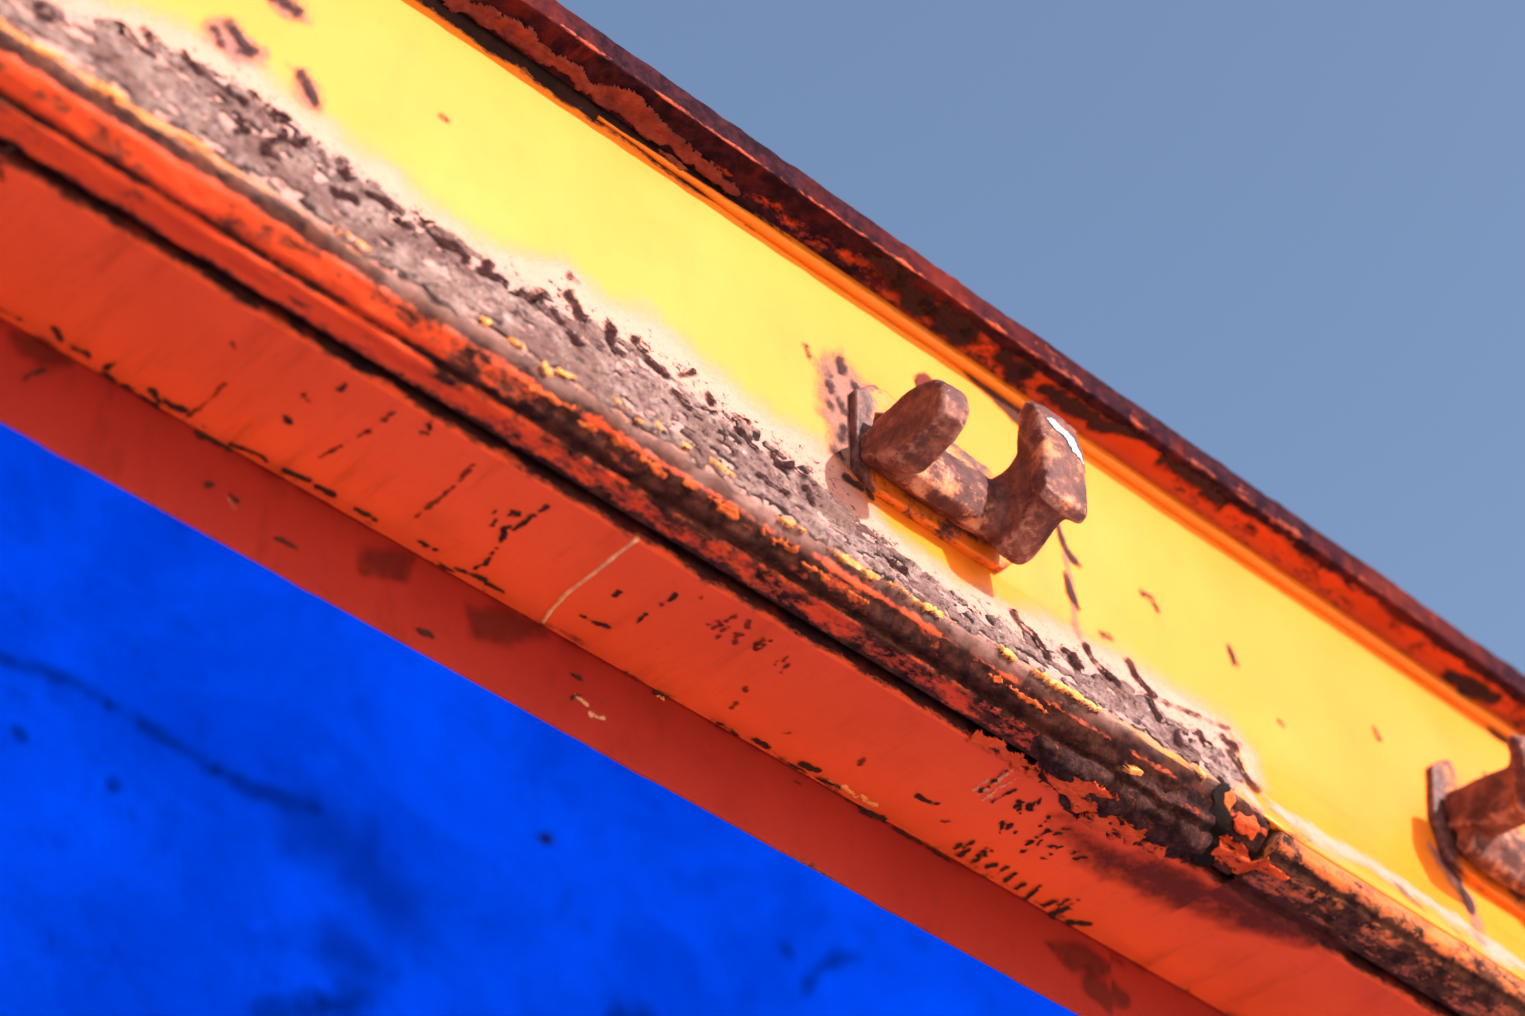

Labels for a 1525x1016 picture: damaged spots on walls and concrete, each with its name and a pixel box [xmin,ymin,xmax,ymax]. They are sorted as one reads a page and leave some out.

peeling [443,0,741,197]
peeling [51,326,189,413]
peeling [195,430,337,498]
rust [0,0,1262,793]
peeling [523,361,739,520]
peeling [417,505,550,593]
peeling [761,516,957,623]
spalling [706,615,773,651]
peeling [988,644,1102,714]
peeling [716,722,1093,926]
peeling [1211,789,1289,881]
rust [1429,843,1483,941]